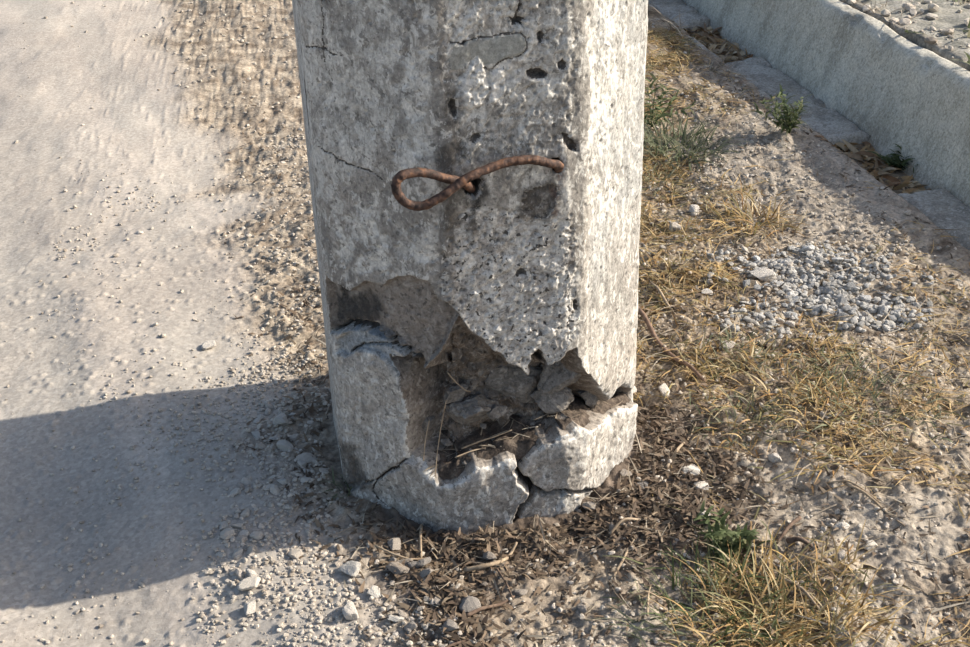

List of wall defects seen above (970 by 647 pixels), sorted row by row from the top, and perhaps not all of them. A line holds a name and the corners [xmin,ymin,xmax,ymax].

crack [306,0,342,62]
crack [449,0,528,70]
crack [318,146,385,182]
spalling [325,178,637,487]
crack [372,458,408,506]
crack [515,459,578,513]